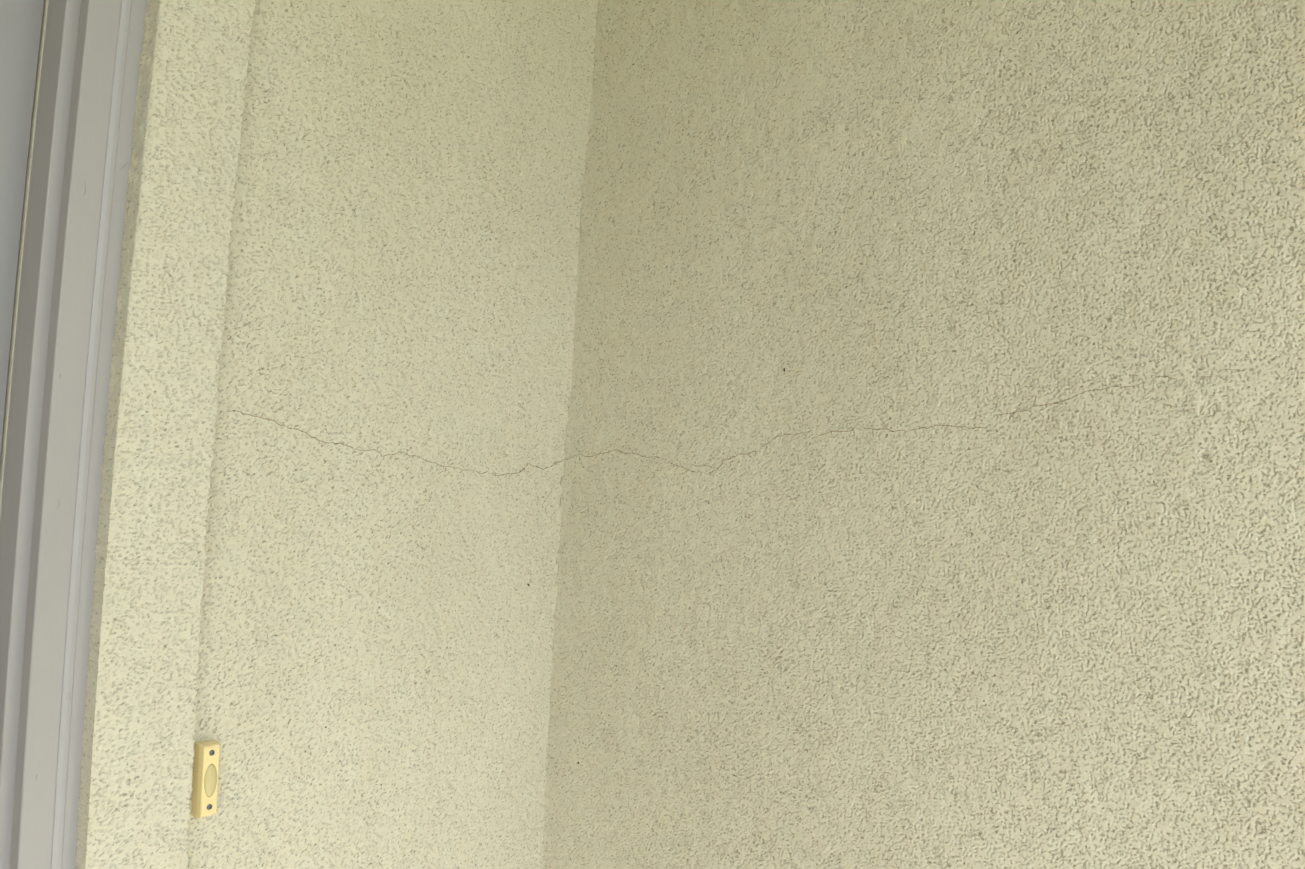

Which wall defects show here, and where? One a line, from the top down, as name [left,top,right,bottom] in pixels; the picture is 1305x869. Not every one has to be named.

crack [218,369,1244,502]